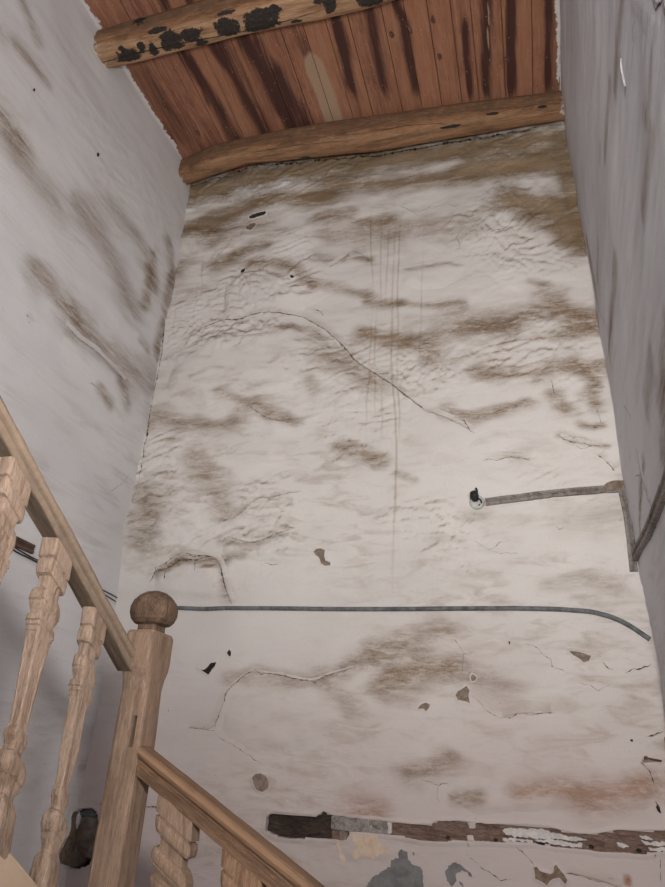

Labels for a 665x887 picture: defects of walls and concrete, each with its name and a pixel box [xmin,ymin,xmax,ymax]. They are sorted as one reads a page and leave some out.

crack [653,0,665,16]
crack [618,58,626,95]
water stain [181,126,592,270]
water stain [248,260,316,287]
water stain [545,299,599,337]
water stain [358,328,432,361]
crack [112,304,477,504]
crack [482,450,531,461]
spalling [311,546,333,568]
water stain [379,657,462,689]
crack [189,659,353,764]
spalling [261,806,665,887]